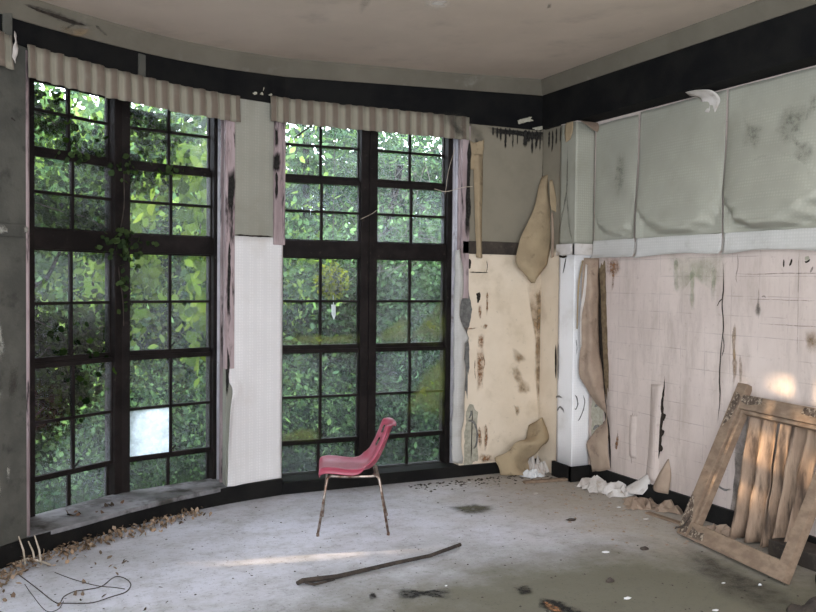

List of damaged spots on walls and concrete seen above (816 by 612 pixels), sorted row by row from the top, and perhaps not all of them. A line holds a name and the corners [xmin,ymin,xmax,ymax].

damp [492,127,561,152]
damp [531,296,541,354]
crack [716,273,724,415]